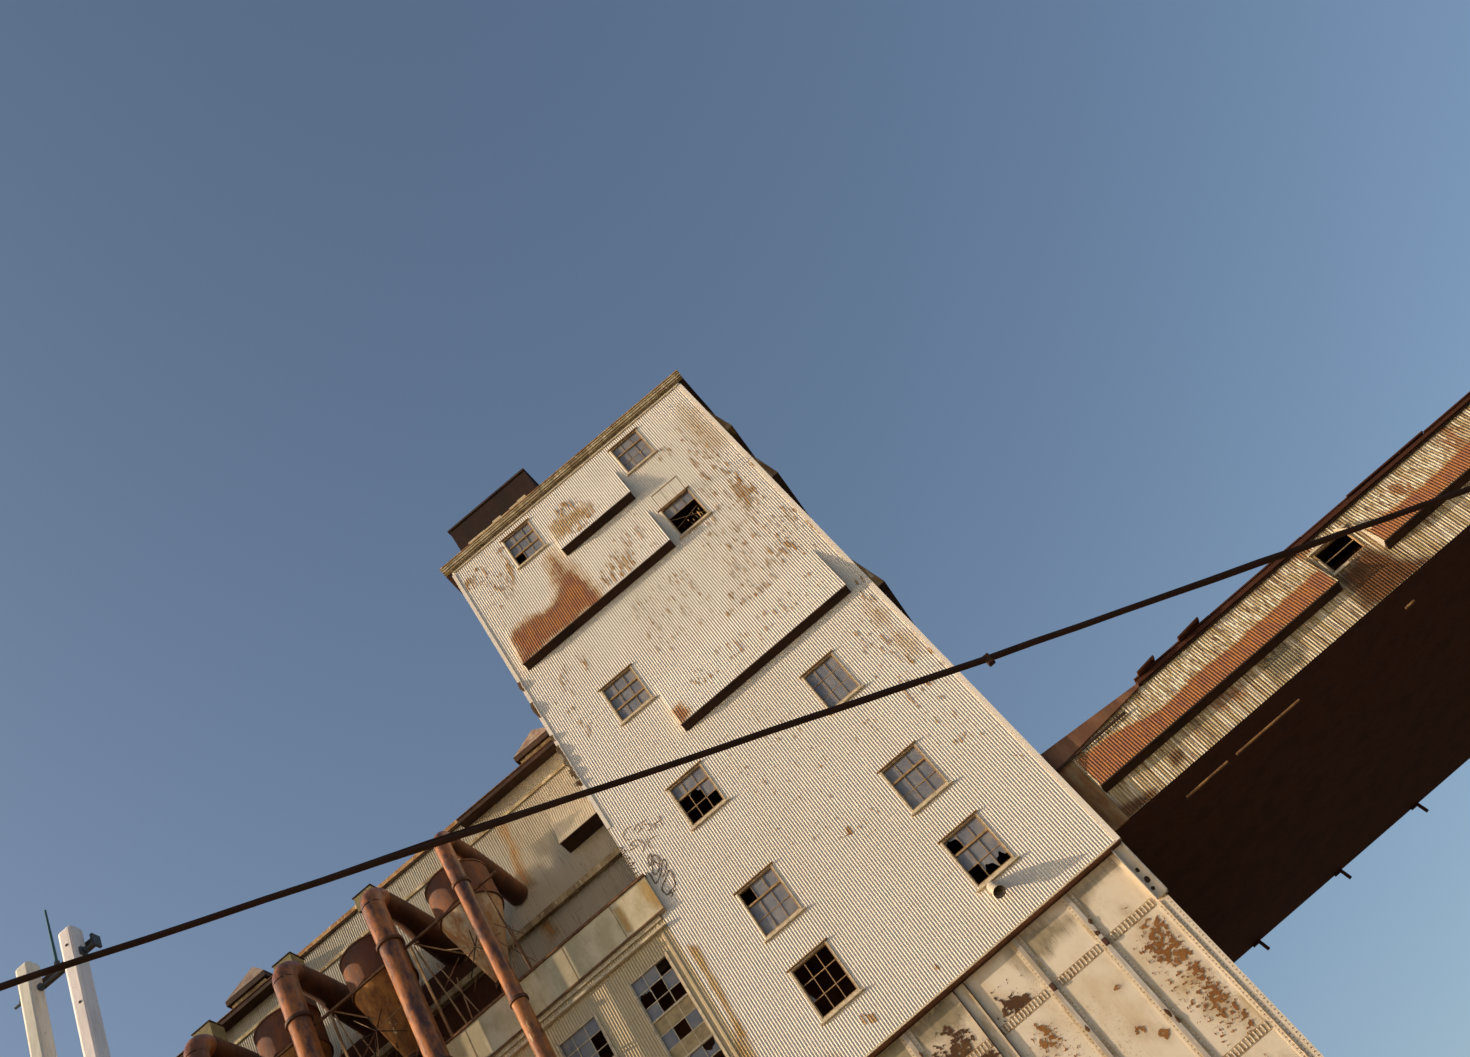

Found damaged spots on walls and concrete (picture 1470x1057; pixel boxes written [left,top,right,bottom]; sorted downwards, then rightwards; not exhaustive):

peeling [464,546,520,611]
rust [511,555,602,663]
peeling [552,498,599,541]
peeling [600,513,659,588]